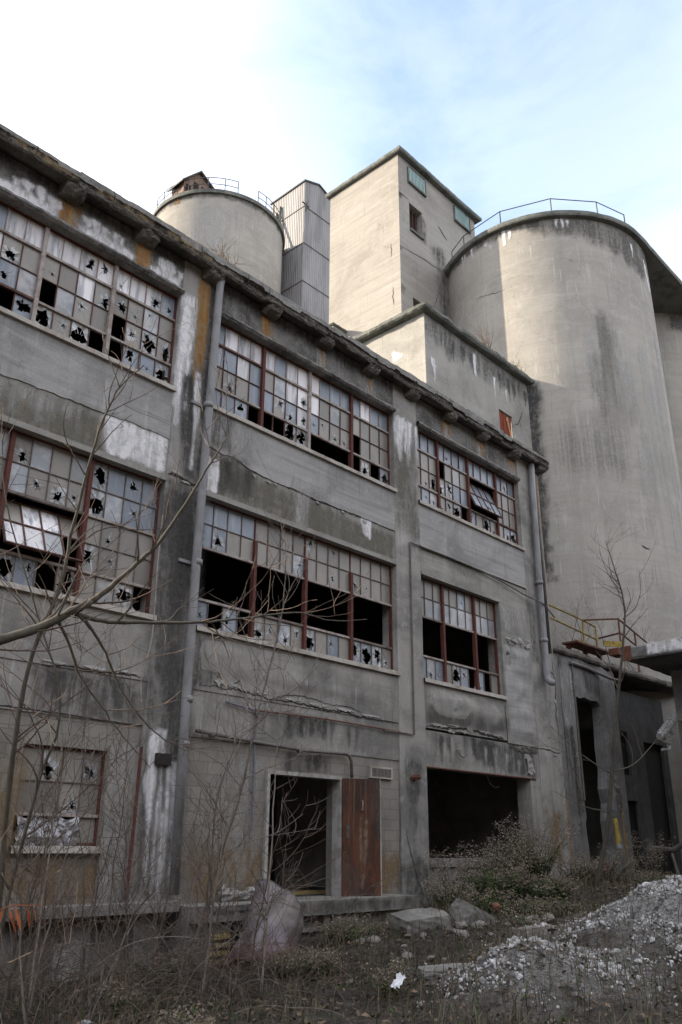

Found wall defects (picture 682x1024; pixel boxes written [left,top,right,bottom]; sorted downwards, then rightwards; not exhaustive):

corrosion [195,279,210,372]
leakage [428,320,543,456]
leakage [0,194,393,903]
leakage [537,475,553,579]
leakage [430,706,534,777]